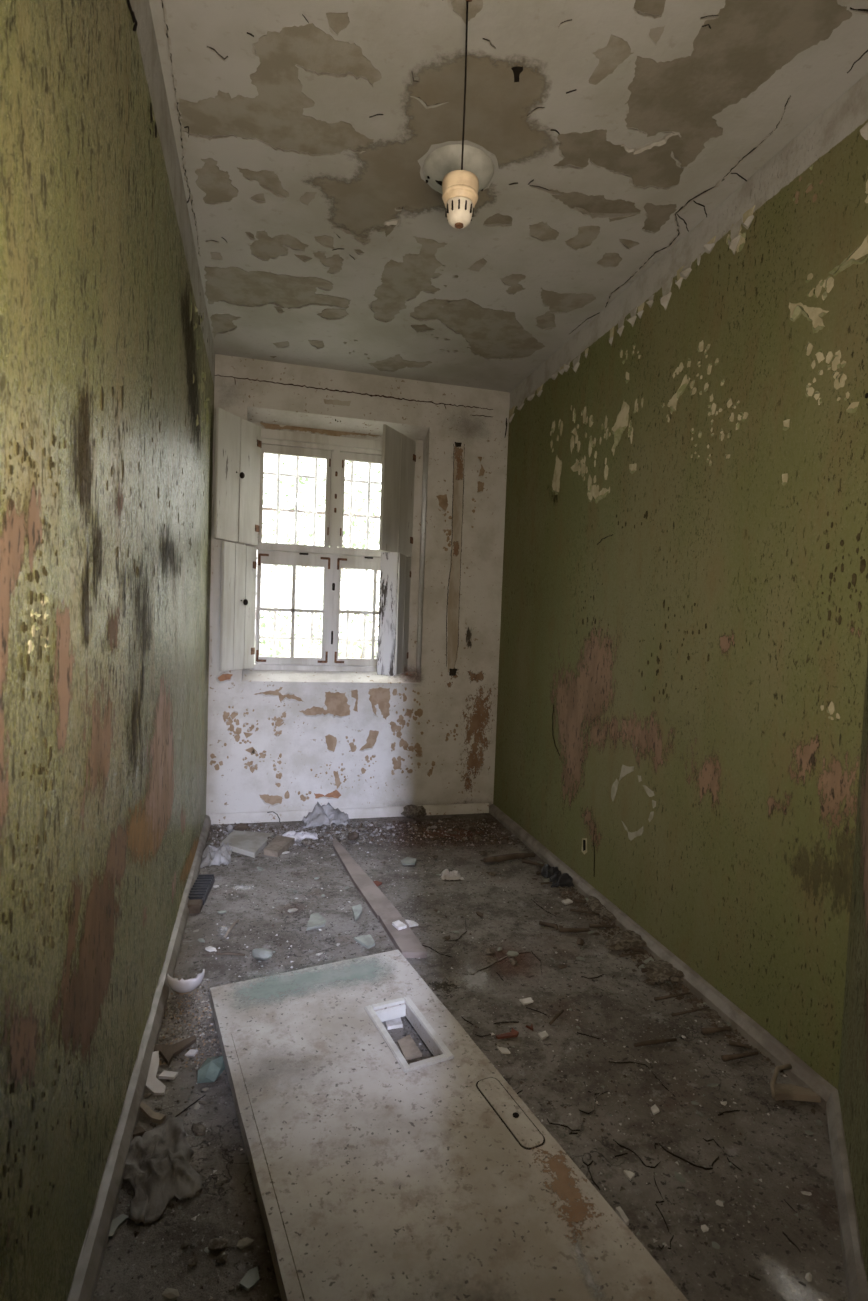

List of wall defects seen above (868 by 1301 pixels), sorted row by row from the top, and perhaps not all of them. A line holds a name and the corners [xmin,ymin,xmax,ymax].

peeling [195,158,317,207]
peeling [178,12,382,156]
peeling [448,0,483,26]
spalling [511,66,523,82]
crack [569,96,791,334]
peeling [553,0,852,268]
crack [849,7,868,15]
peeling [343,236,596,372]
peeling [106,208,402,578]
peeling [550,398,644,504]
peeling [0,419,66,968]
peeling [210,687,435,807]